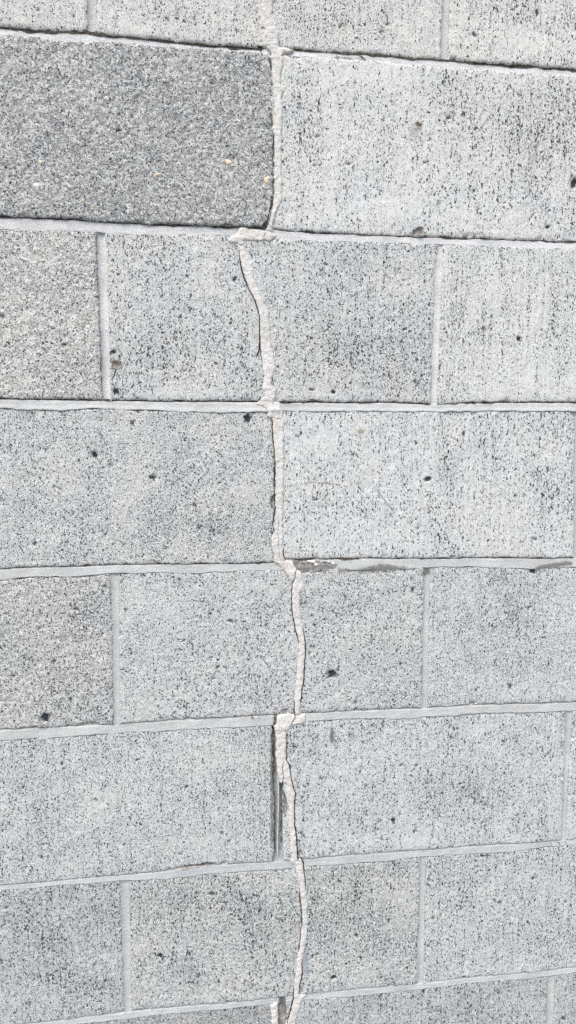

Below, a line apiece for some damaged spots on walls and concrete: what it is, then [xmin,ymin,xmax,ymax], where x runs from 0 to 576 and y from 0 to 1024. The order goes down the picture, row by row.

crack [228,0,341,1024]